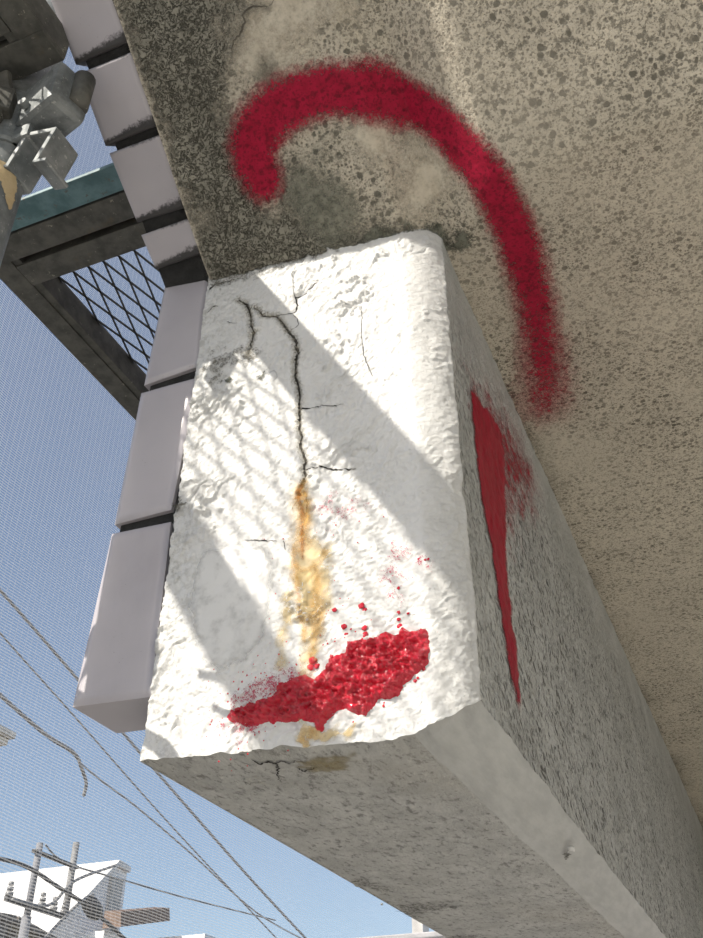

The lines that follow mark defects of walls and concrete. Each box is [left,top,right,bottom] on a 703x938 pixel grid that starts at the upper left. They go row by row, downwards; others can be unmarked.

crack [231,0,274,56]
leakage [117,0,474,287]
crack [207,268,354,558]
rust [279,488,330,673]
rust [296,723,355,747]